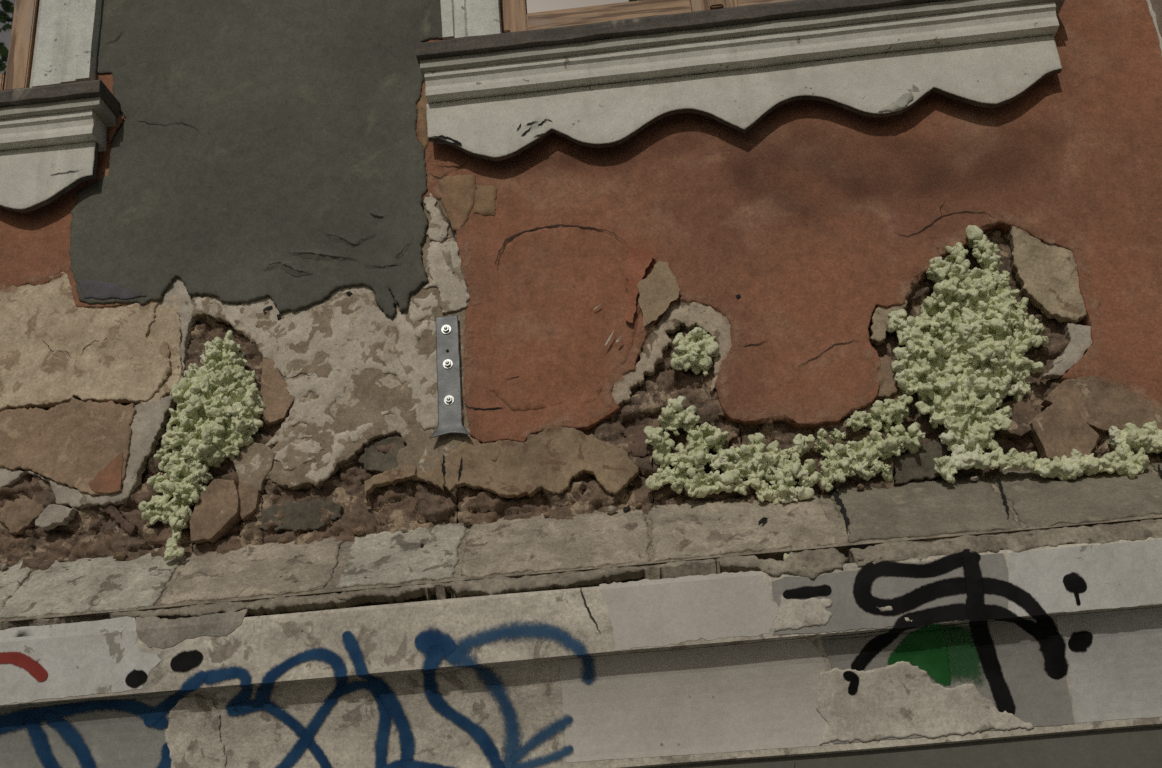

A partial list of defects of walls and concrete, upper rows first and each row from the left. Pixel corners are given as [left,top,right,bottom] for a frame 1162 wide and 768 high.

flaking render [0,175,1162,573]
spalling [136,609,247,648]
peeling [816,661,1034,745]